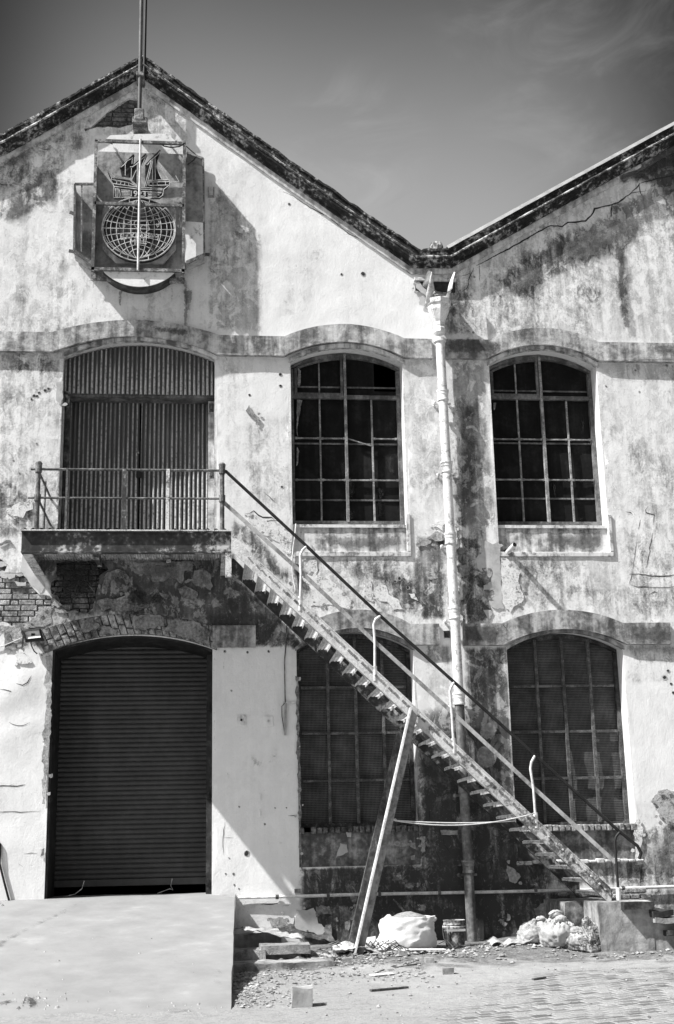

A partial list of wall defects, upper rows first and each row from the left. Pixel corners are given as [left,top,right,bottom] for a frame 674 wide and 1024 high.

damp [0,135,54,170]
crack [463,175,674,291]
damp [564,203,641,328]
damp [449,338,498,353]
flaking render [0,556,226,804]
spalling [651,789,674,824]